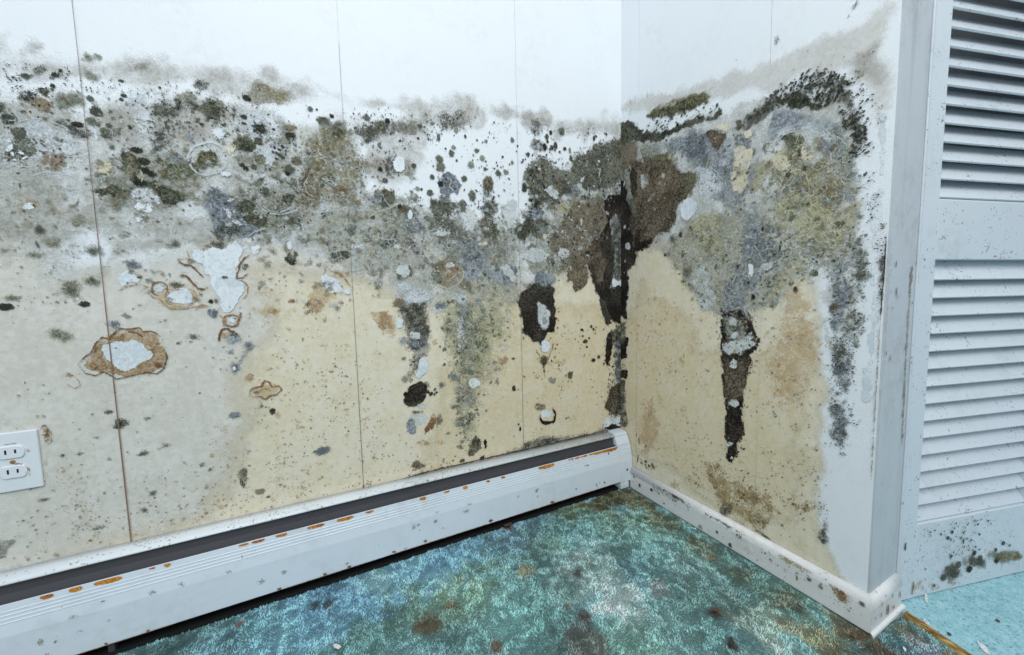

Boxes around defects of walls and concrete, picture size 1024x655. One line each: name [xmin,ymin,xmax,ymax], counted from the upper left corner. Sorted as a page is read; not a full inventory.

peeling [192,240,270,318]
water stain [0,46,917,579]
rust [69,576,122,592]
rust [277,519,493,590]
water stain [914,516,1022,585]